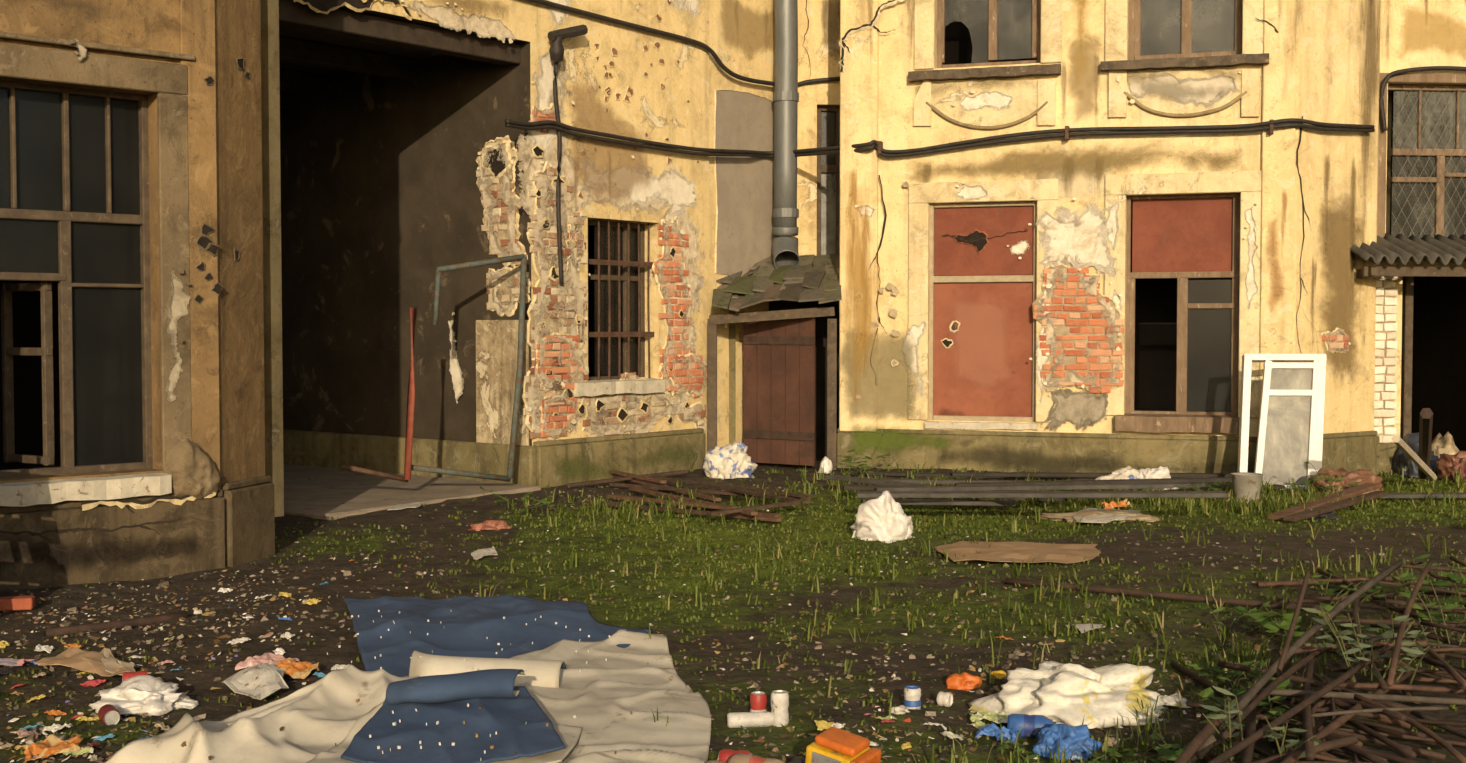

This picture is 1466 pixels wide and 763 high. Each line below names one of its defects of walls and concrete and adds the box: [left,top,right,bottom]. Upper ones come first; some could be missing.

spalling [236,56,251,79]
spalling [294,0,517,43]
peeling [546,0,571,30]
peeling [655,0,704,22]
crack [803,0,905,75]
flaking render [476,42,779,441]
spalling [166,223,240,402]
flaking render [1006,194,1125,432]
peeling [448,312,464,403]